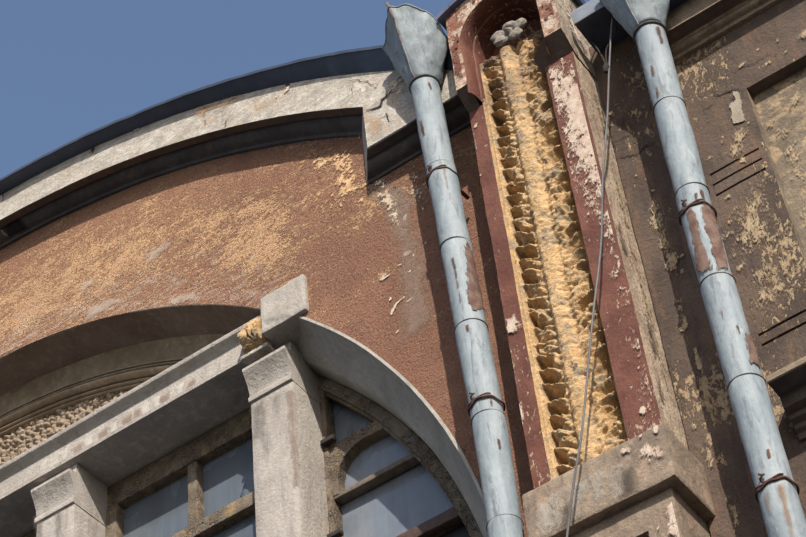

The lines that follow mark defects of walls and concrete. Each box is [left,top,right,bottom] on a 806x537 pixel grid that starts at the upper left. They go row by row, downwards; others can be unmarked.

crack [351,76,402,121]
spalling [721,91,749,162]
peeling [766,122,806,185]
peeling [300,148,407,226]
peeling [548,58,676,414]
peeling [650,202,684,275]
peeling [722,184,778,271]
peeling [752,261,790,316]
peeling [693,346,703,370]
peeling [701,432,727,467]
peeling [657,502,680,537]